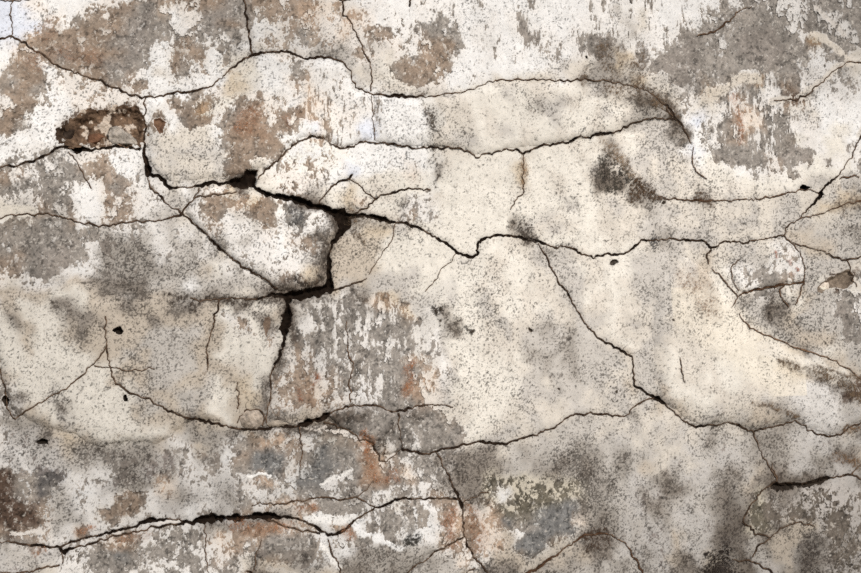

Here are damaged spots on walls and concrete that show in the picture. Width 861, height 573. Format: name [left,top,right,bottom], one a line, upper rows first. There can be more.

crack [0,0,84,76]
peeling [635,0,861,198]
crack [0,144,141,168]
crack [0,177,278,290]
peeling [0,0,584,573]
crack [87,0,861,423]
water stain [596,139,666,205]
crack [0,243,861,573]
crack [526,532,643,573]